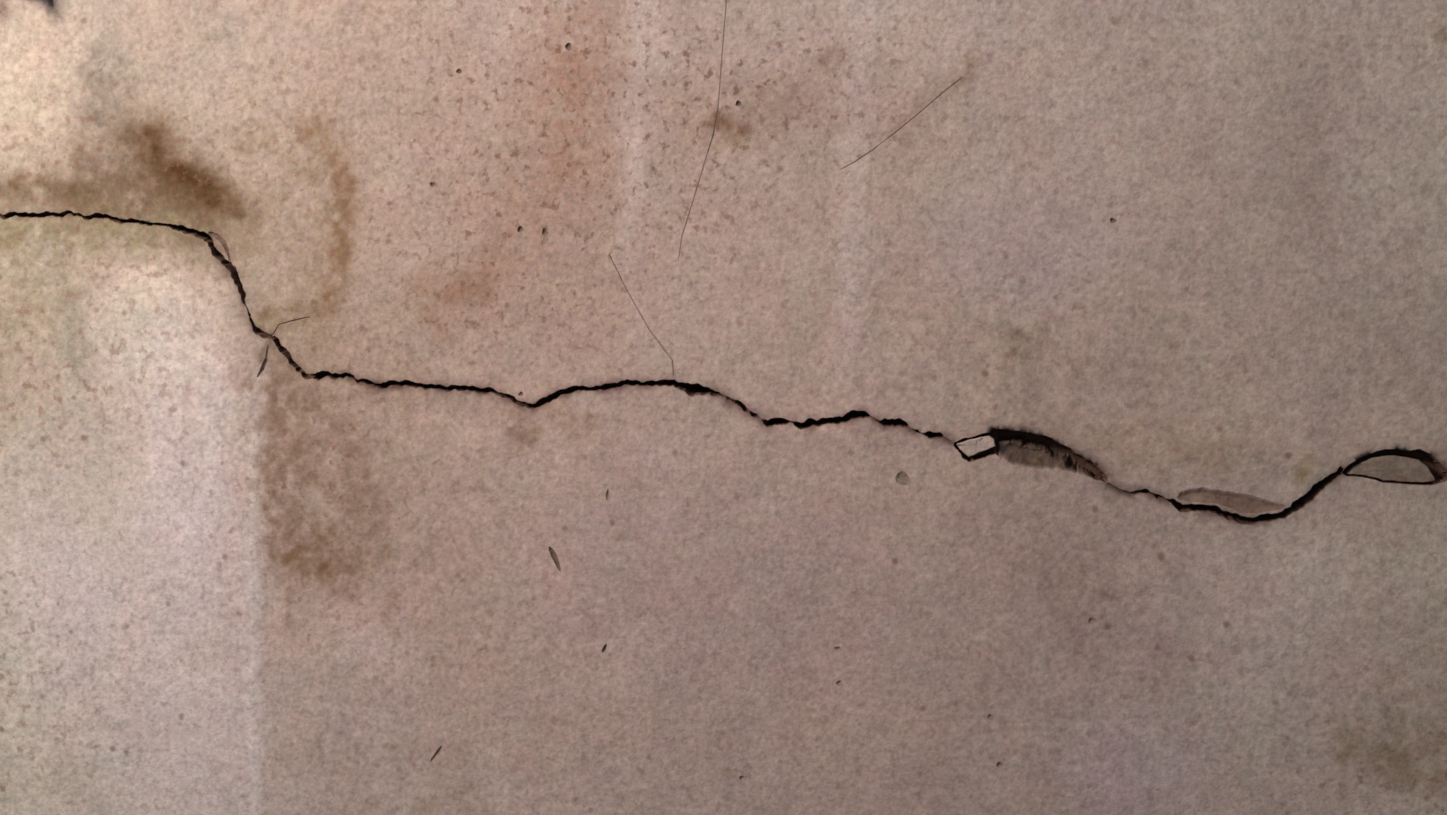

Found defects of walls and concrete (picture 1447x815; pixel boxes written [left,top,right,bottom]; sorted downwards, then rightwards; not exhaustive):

leakage [0,27,449,639]
crack [0,210,951,441]
flaking render [953,428,1107,482]
crack [1109,448,1447,525]